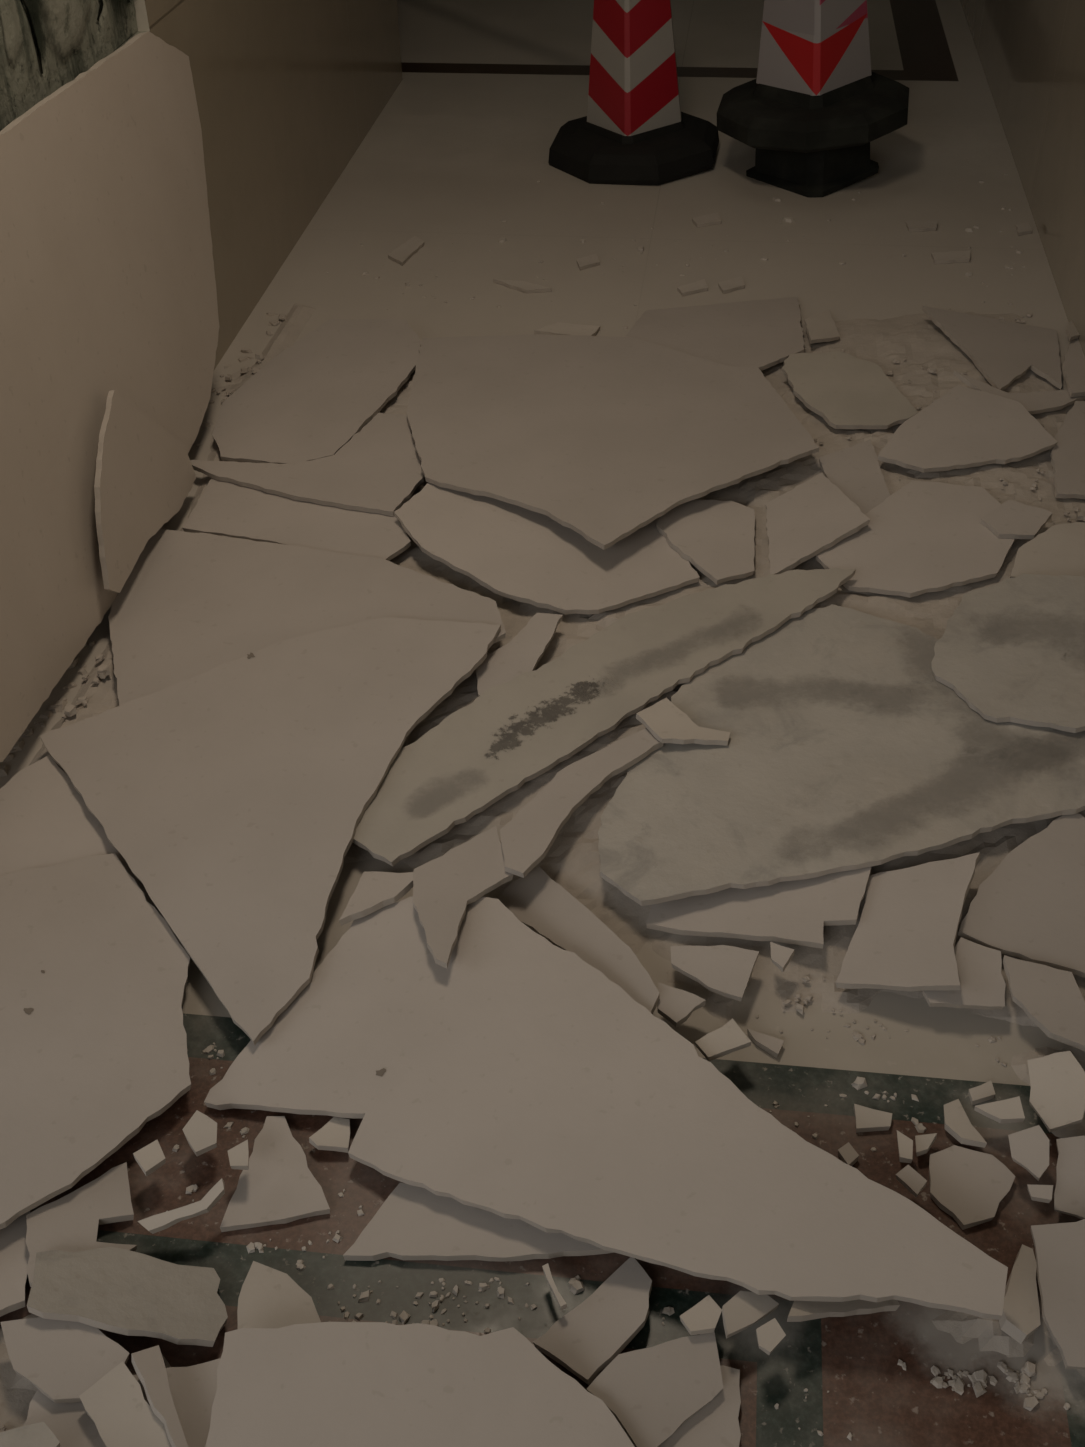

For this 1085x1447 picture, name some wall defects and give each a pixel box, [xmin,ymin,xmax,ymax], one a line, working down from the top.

crack [22,0,43,74]
spalling [0,0,138,131]
crack [97,0,130,21]
spalling [656,500,755,585]
spalling [980,500,1085,578]
spalling [475,613,563,696]
spalling [636,698,730,746]
spalling [339,826,795,1027]
peeling [695,1018,784,1061]
spalling [835,852,1085,1369]
spalling [0,1110,350,1447]
spalling [533,1257,900,1447]